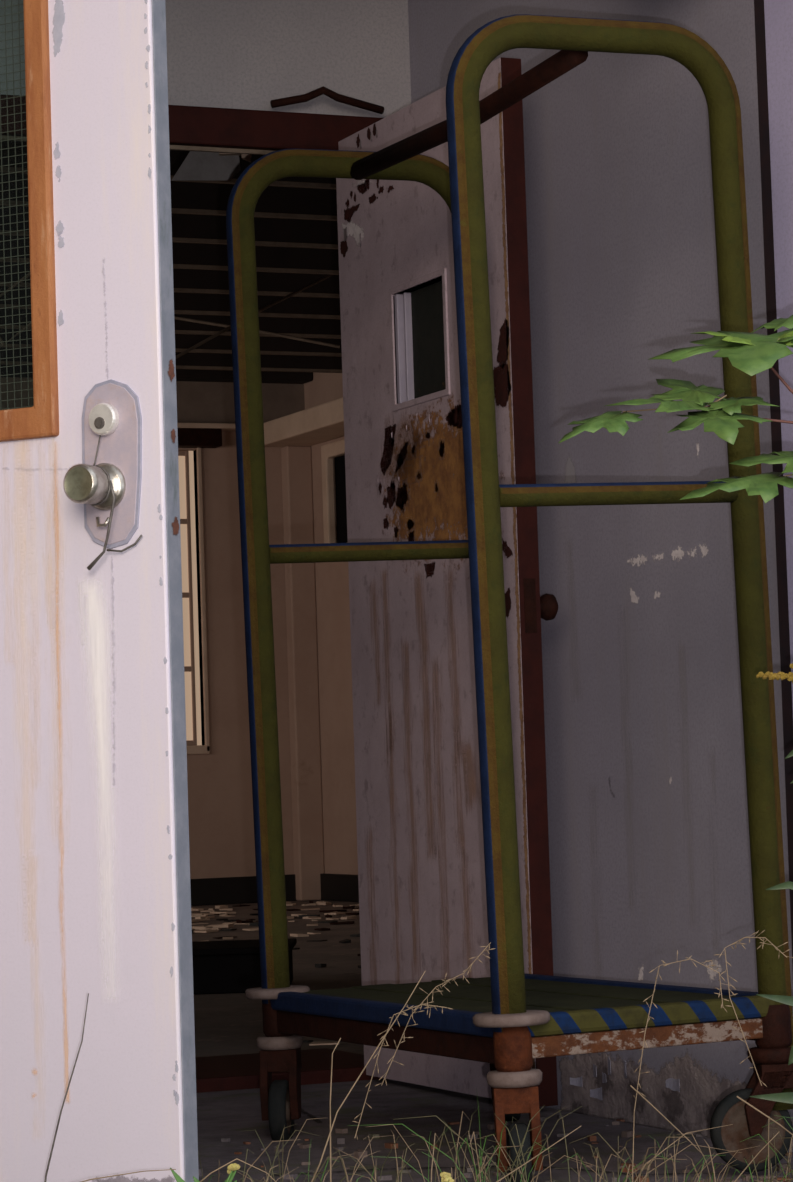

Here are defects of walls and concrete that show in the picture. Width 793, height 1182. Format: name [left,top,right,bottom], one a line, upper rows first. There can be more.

peeling [52,0,65,56]
peeling [340,179,394,258]
peeling [446,404,462,428]
peeling [378,414,444,541]
peeling [424,563,435,577]